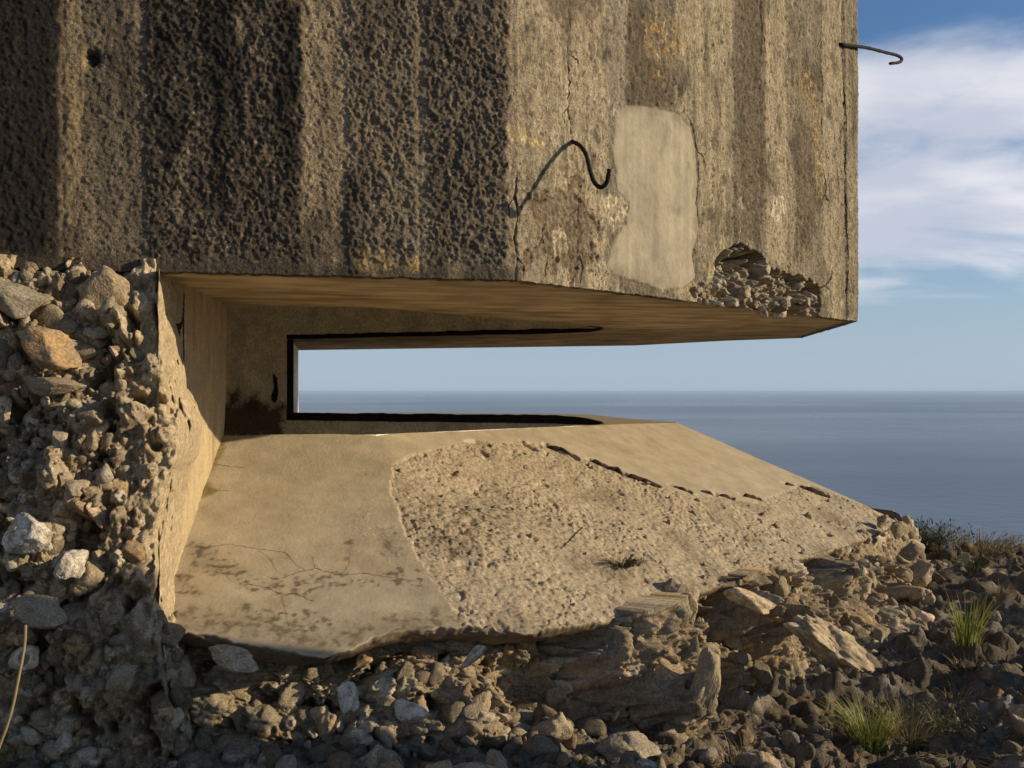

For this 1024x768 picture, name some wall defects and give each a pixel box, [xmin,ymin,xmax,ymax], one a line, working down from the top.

crack [563,9,579,135]
crack [817,4,849,307]
crack [508,176,548,280]
spalling [688,242,821,320]
crack [187,544,418,626]
spalling [389,440,895,635]